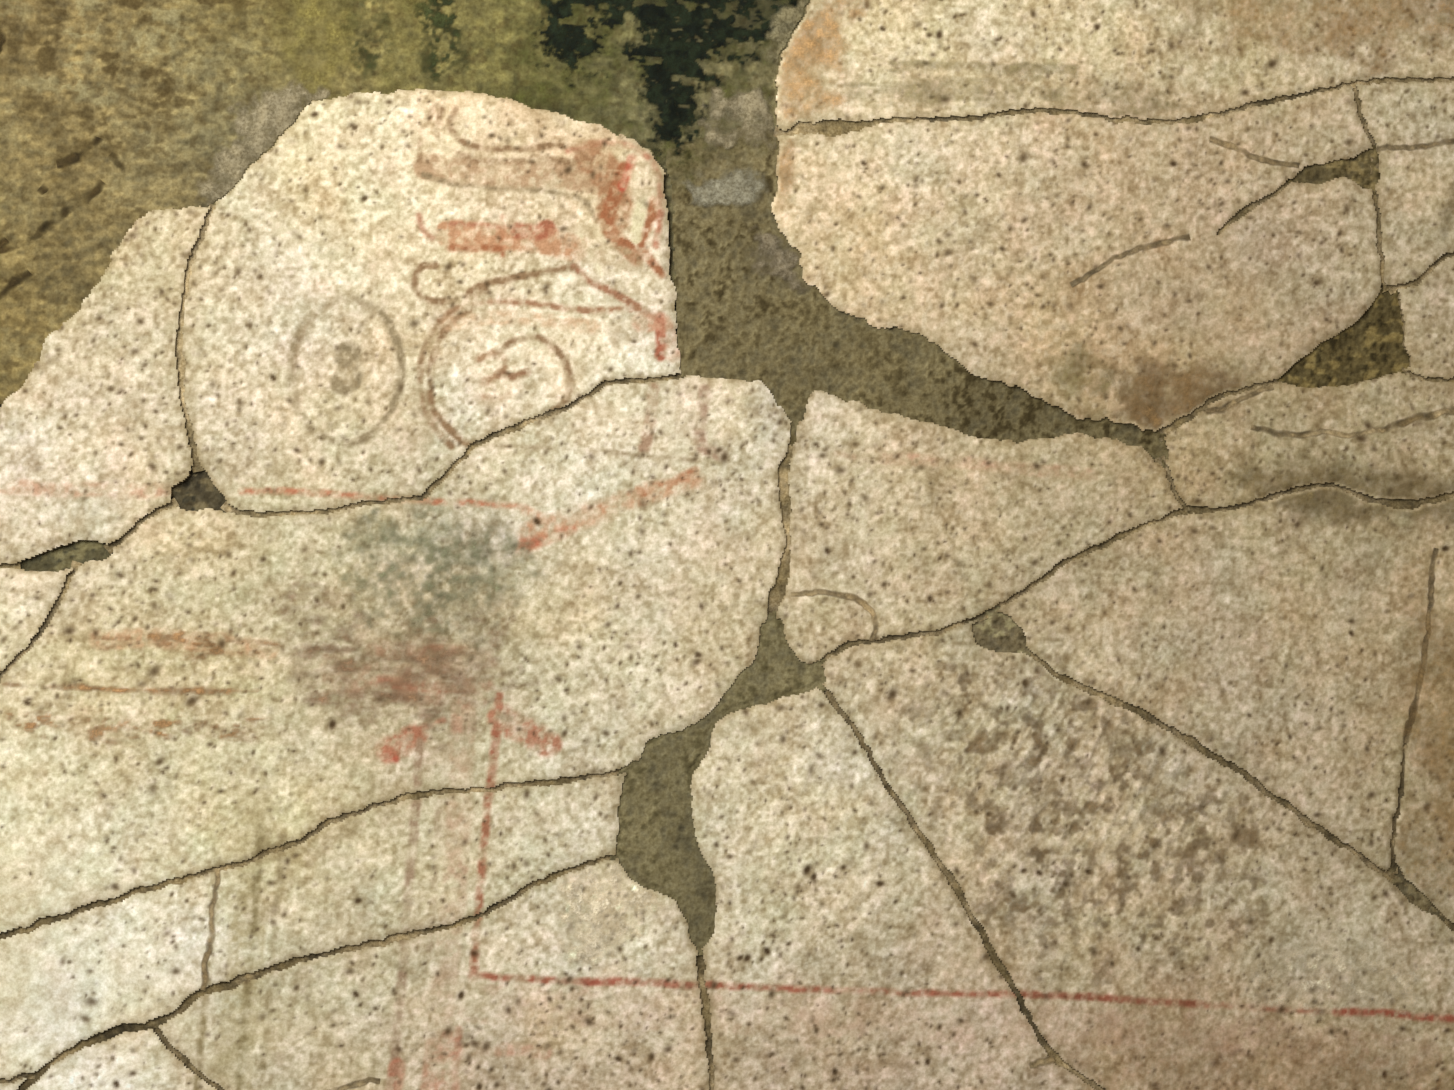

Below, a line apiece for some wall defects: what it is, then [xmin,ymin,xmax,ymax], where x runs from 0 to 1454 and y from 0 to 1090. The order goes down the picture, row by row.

leakage [406,0,468,78]
leakage [515,0,840,157]
spalling [0,0,1168,468]
crack [773,77,1454,294]
spalling [1277,283,1410,388]
crack [220,373,682,518]
spalling [20,540,113,572]
leakage [306,635,355,672]
leakage [381,527,501,624]
spalling [610,611,826,955]
crack [767,367,1454,1090]
crack [0,767,623,1090]